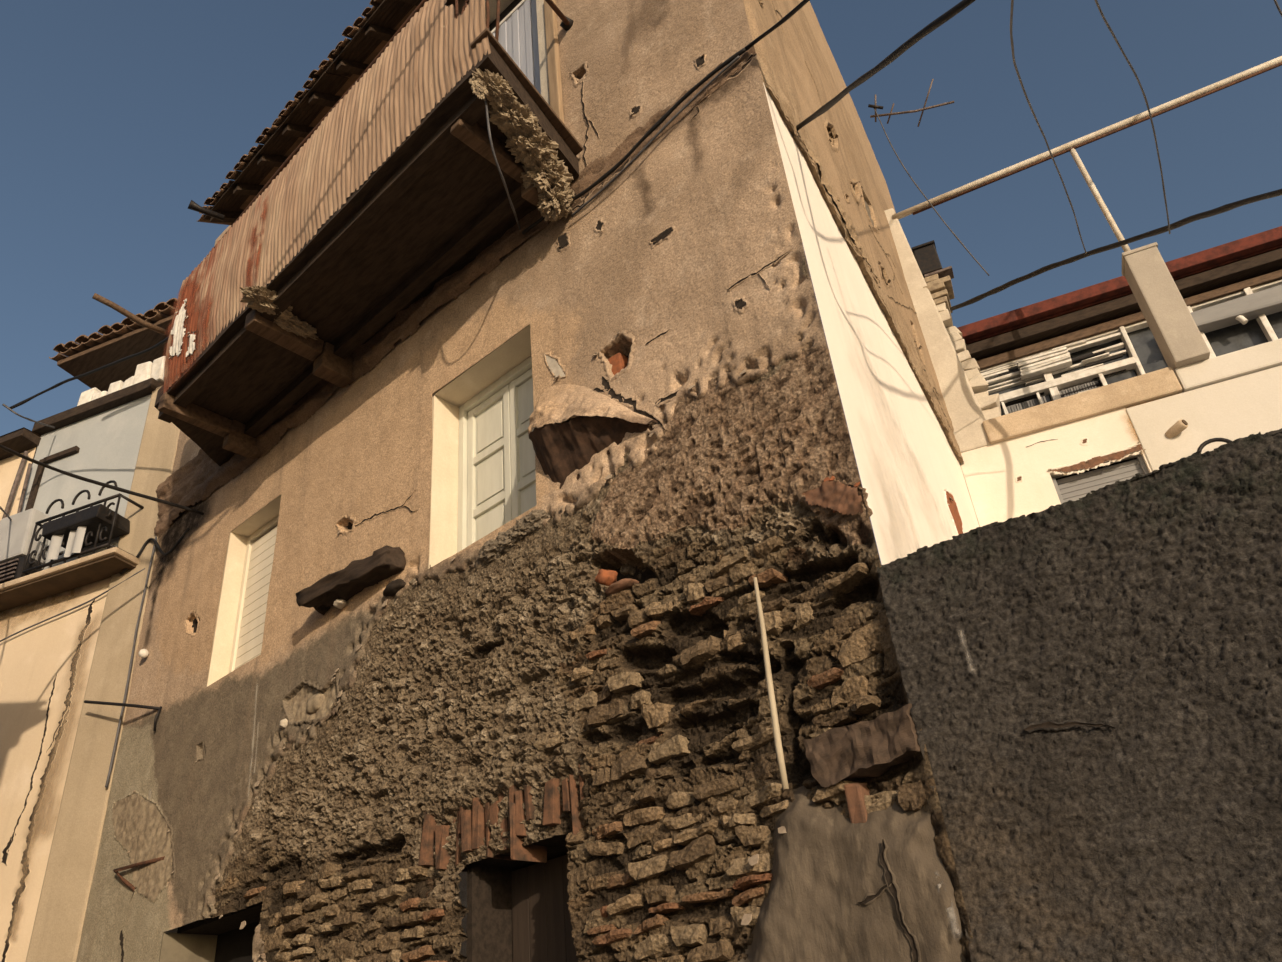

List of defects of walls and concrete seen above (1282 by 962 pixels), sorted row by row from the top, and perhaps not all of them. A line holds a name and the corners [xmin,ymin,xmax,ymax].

corrosion [165,280,212,382]
corrosion [246,199,267,287]
spalling [469,68,575,253]
crack [569,53,757,215]
crack [727,249,792,291]
spalling [792,132,891,290]
crack [354,490,417,528]
spalling [1048,437,1146,475]
spalling [212,318,973,962]
crack [0,599,96,962]
crack [858,839,921,962]